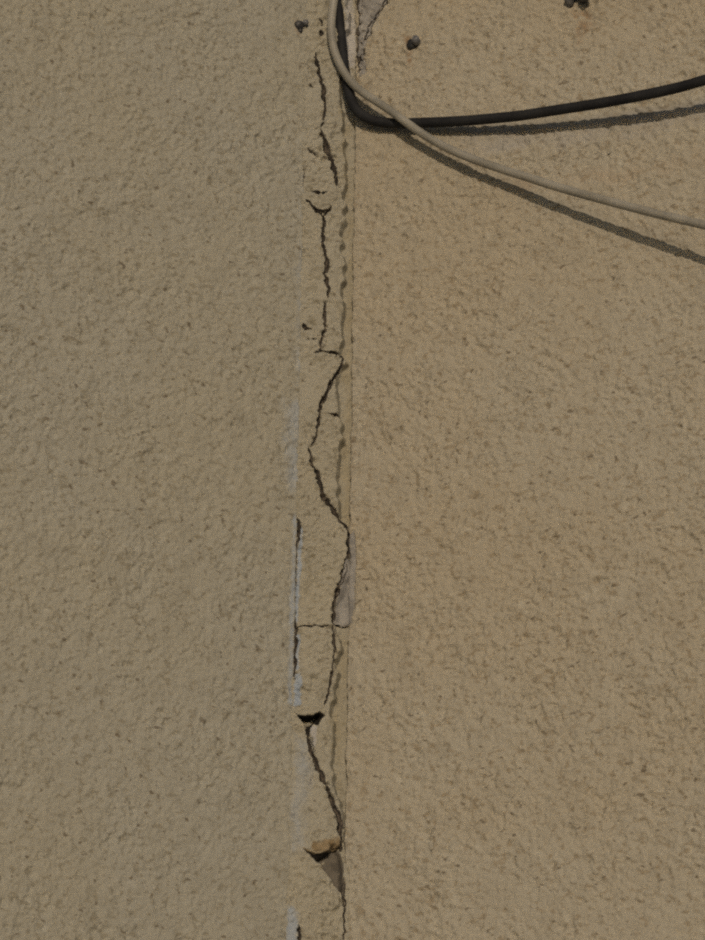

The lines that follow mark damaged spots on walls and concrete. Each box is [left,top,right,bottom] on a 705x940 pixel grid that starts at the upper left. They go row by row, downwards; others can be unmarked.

spalling [342,0,388,92]
crack [293,18,350,704]
spalling [333,530,356,628]
peeling [285,512,344,897]
crack [296,713,344,851]
crack [339,882,347,940]